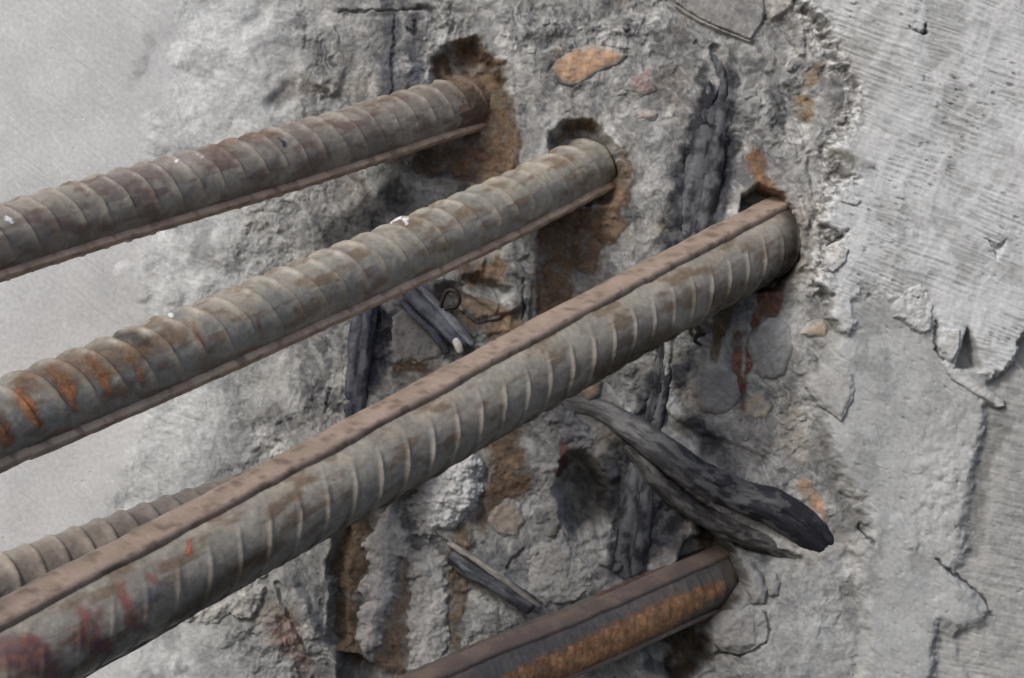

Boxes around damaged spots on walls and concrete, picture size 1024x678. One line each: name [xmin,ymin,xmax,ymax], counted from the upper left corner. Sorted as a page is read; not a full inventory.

spalling [0,79,486,318]
corrosion [414,38,522,184]
corrosion [556,120,596,145]
corrosion [533,151,633,315]
corrosion [746,149,785,200]
spalling [0,138,616,598]
spalling [147,0,871,678]
corrosion [710,281,783,409]
corrosion [661,627,710,678]
corrosion [691,526,725,549]
spalling [818,284,1024,678]
crack [937,559,987,604]